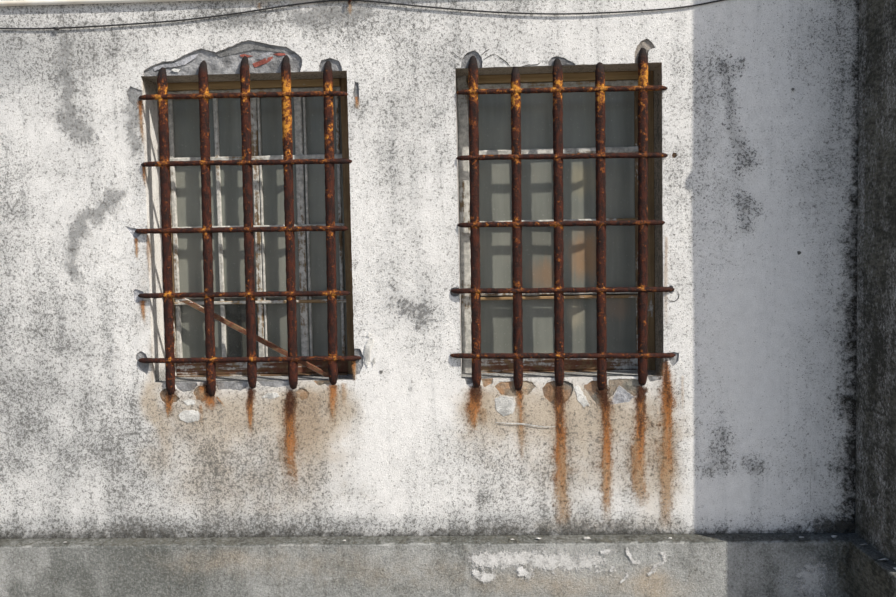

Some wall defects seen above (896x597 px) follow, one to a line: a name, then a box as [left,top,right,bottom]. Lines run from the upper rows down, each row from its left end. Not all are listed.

water stain [53,39,98,143]
flaking render [144,40,302,76]
water stain [65,190,125,280]
water stain [377,0,859,536]
corrosion [283,390,298,478]
corrosion [553,386,569,521]
flaking render [465,376,661,417]
corrosion [598,386,613,509]
corrosion [632,386,648,499]
corrosion [659,358,676,519]
water stain [0,525,367,539]
water stain [465,546,640,583]